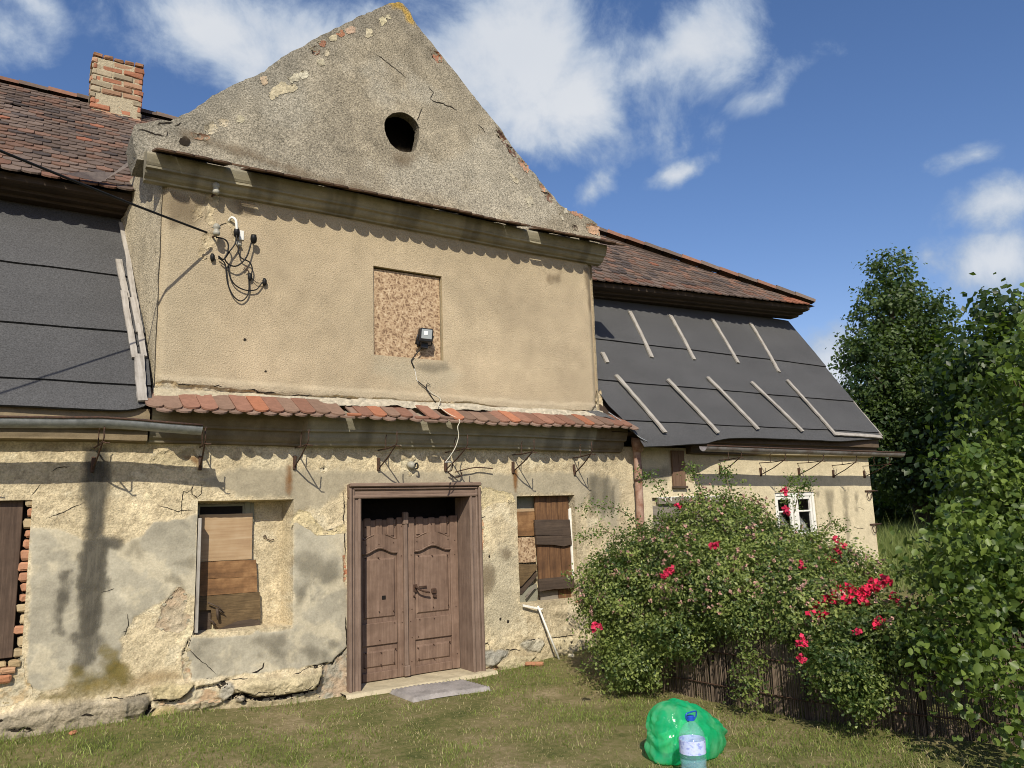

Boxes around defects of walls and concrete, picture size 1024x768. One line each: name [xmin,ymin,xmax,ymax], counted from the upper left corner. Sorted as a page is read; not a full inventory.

spalling [309,14,391,66]
spalling [191,193,242,260]
crack [161,484,202,517]
spalling [290,509,346,536]
water stain [57,449,122,672]
spalling [155,587,191,633]